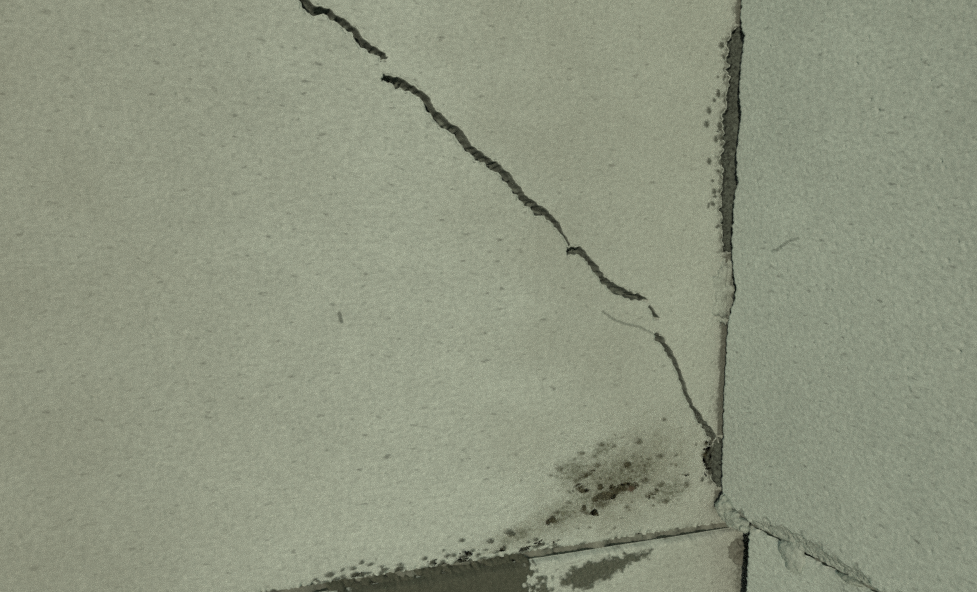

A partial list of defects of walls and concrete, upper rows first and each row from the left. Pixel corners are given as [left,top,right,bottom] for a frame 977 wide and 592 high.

crack [297,0,719,444]
damp [581,453,677,515]